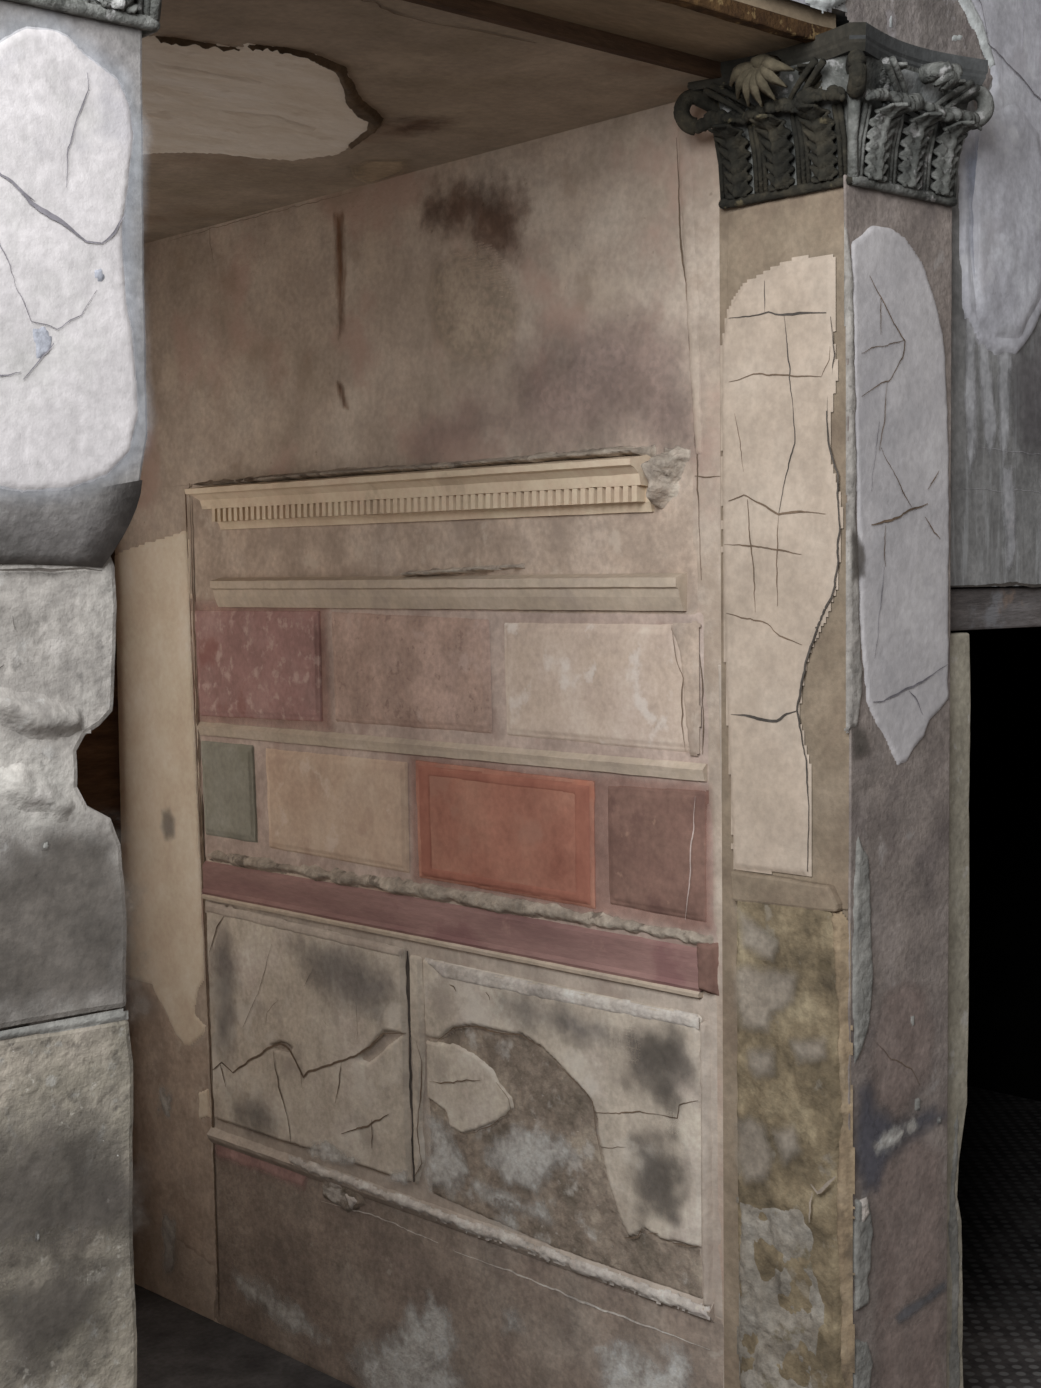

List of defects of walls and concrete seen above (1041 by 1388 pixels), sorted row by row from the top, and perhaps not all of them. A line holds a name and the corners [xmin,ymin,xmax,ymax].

crack [0,73,125,244]
peeling [142,36,384,161]
spalling [805,0,995,111]
crack [0,245,97,379]
water stain [965,318,1041,567]
crack [672,275,948,872]
crack [213,944,698,1177]
spalling [426,1027,703,1299]
water stain [639,1150,679,1221]
water stain [631,1036,688,1106]
spalling [730,837,873,1388]
water stain [0,1265,96,1359]